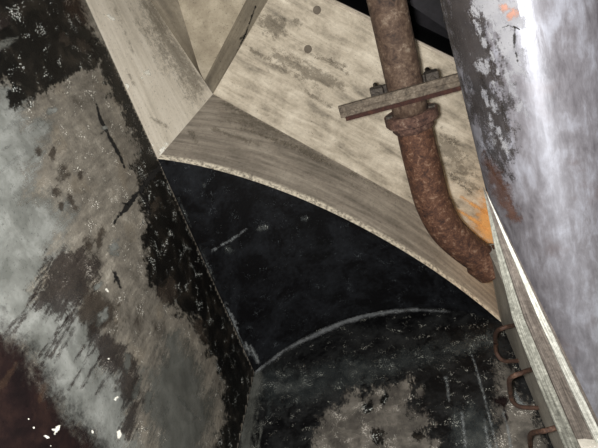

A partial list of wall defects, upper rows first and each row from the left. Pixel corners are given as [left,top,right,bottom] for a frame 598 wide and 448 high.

crack [96,104,125,168]
crack [113,162,162,224]
rust [461,198,494,244]
rust [481,158,519,220]
water stain [0,86,140,448]
water stain [142,329,216,448]
rust [495,397,509,420]